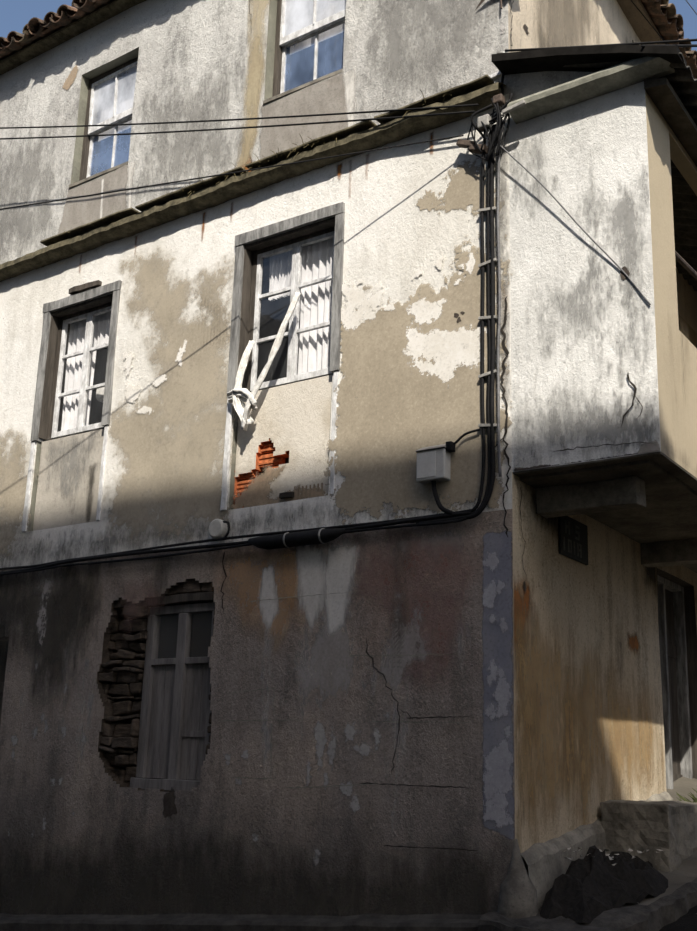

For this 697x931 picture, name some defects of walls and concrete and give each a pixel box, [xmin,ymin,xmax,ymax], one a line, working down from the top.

leakage [540,0,589,48]
peeling [417,153,505,219]
peeling [108,234,512,539]
crack [554,373,658,452]
flaking render [98,579,215,787]
peeling [260,567,278,627]
peeling [296,539,365,707]
crack [366,637,412,774]
peeling [481,531,515,840]
rust [514,581,530,700]
spalling [163,788,177,818]
leakage [0,840,492,916]